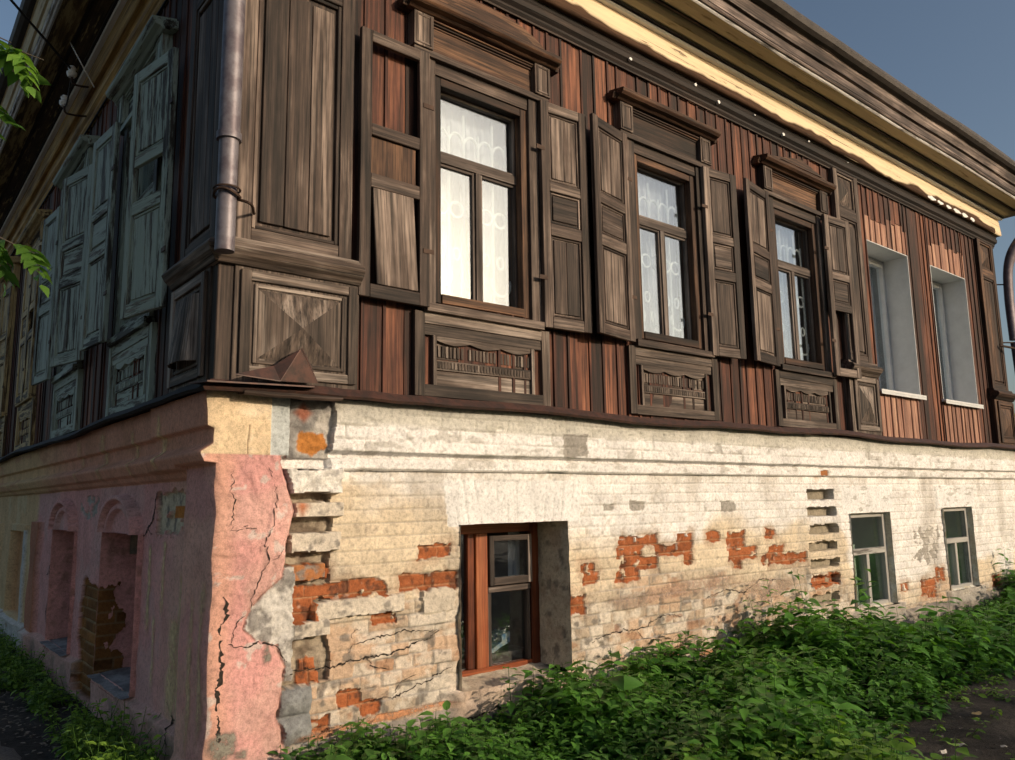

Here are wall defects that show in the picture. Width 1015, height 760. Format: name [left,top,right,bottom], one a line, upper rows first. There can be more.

crack [214,468,453,743]
spalling [243,399,459,685]
spalling [570,562,600,616]
spalling [614,527,808,583]
spalling [811,571,842,589]
spalling [900,530,946,597]
spalling [69,576,126,696]
spalling [311,687,383,734]
flaking render [209,733,246,760]